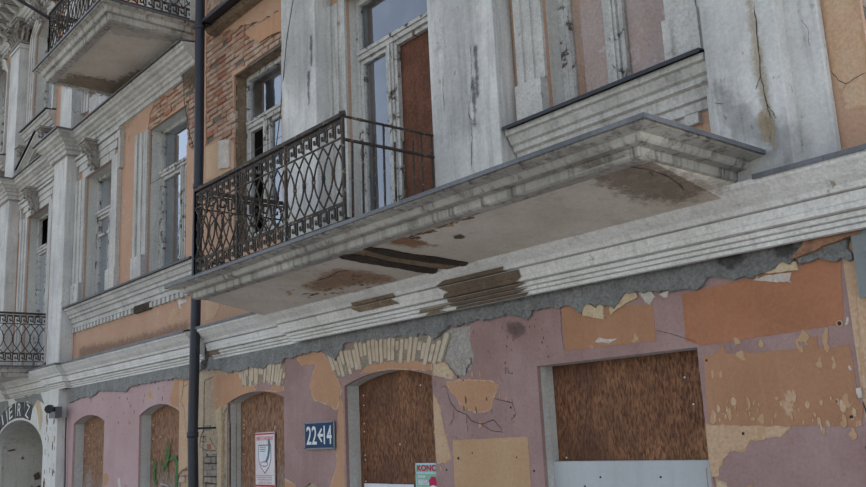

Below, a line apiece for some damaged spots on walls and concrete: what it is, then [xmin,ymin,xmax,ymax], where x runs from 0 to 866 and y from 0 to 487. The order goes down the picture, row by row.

flaking render [149,81,195,159]
flaking render [205,10,282,179]
crack [754,10,776,140]
peeling [822,0,866,111]
water stain [583,156,719,201]
peeling [286,275,399,312]
peeling [352,250,528,316]
flaking render [582,291,669,319]
peeling [203,363,286,487]
flaking render [297,325,515,487]
crack [443,386,516,432]
peeling [705,285,866,487]